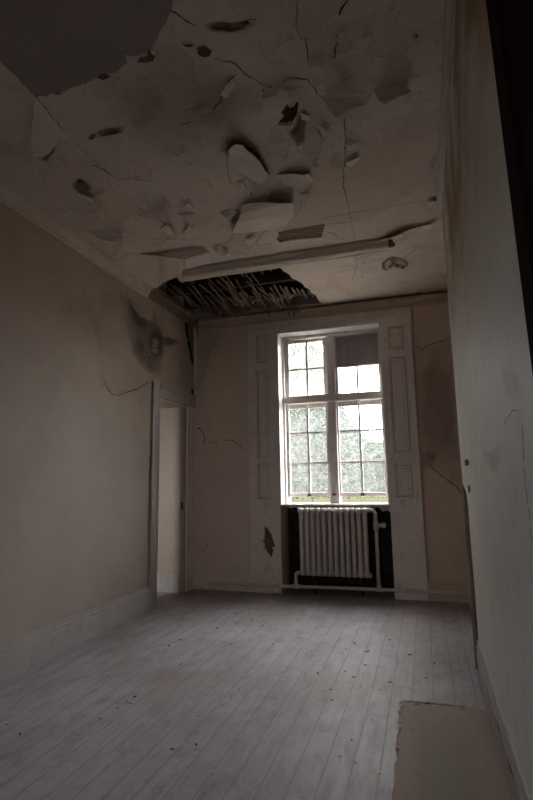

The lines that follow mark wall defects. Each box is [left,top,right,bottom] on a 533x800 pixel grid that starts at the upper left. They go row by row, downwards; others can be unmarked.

peeling [0,0,173,97]
flaking render [182,40,212,57]
crack [332,0,348,58]
crack [184,58,320,124]
flaking render [279,102,298,124]
peeling [219,140,325,243]
crack [320,119,428,279]
peeling [88,227,211,287]
peeling [262,526,275,557]